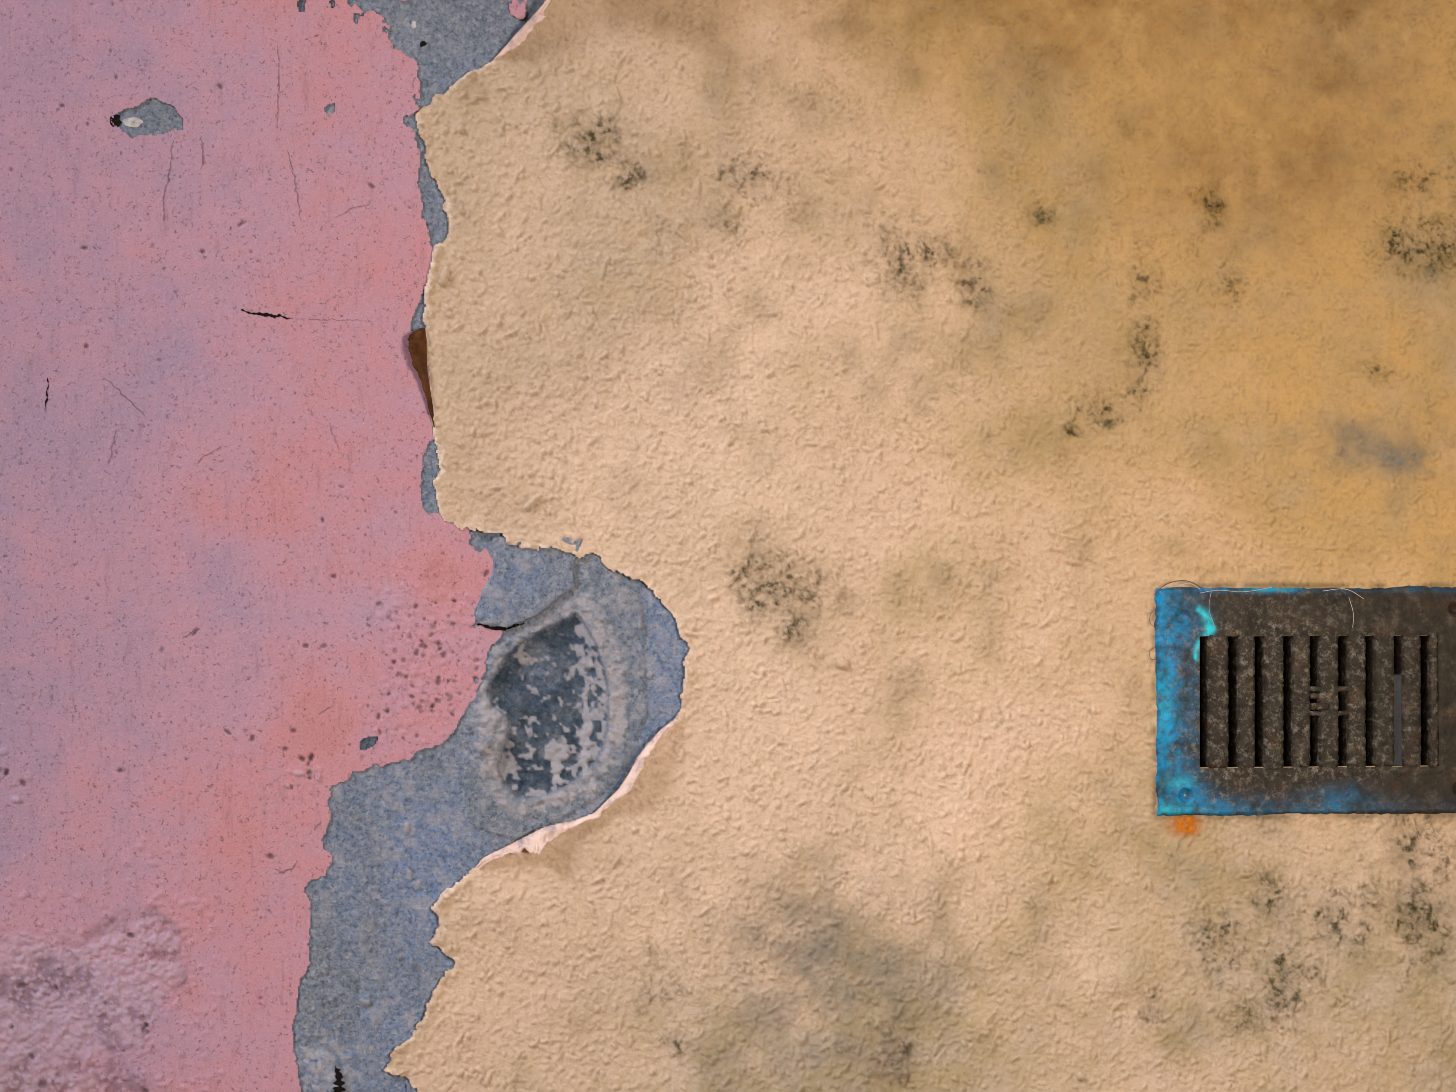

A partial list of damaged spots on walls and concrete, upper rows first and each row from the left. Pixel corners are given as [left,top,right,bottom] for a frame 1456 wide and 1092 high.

peeling [115,98,183,138]
peeling [329,0,627,247]
crack [241,309,361,321]
peeling [408,285,441,515]
crack [477,622,525,631]
peeling [292,528,690,1092]